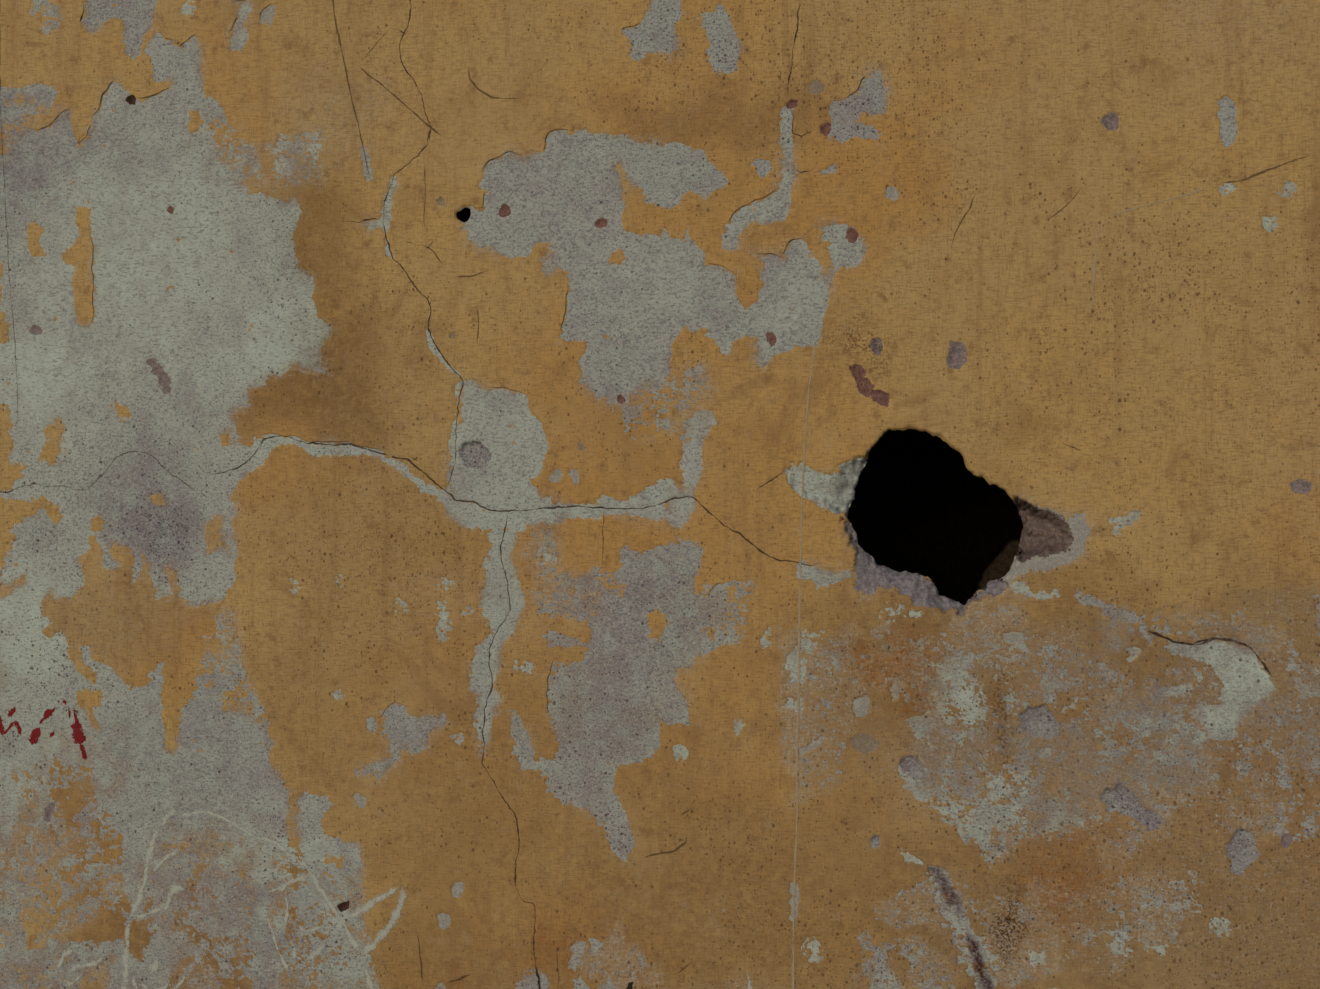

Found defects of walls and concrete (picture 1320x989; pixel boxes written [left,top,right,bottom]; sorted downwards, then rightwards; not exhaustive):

crack [0,0,816,989]
peeling [0,0,890,989]
peeling [779,454,1320,989]
crack [1148,631,1271,675]